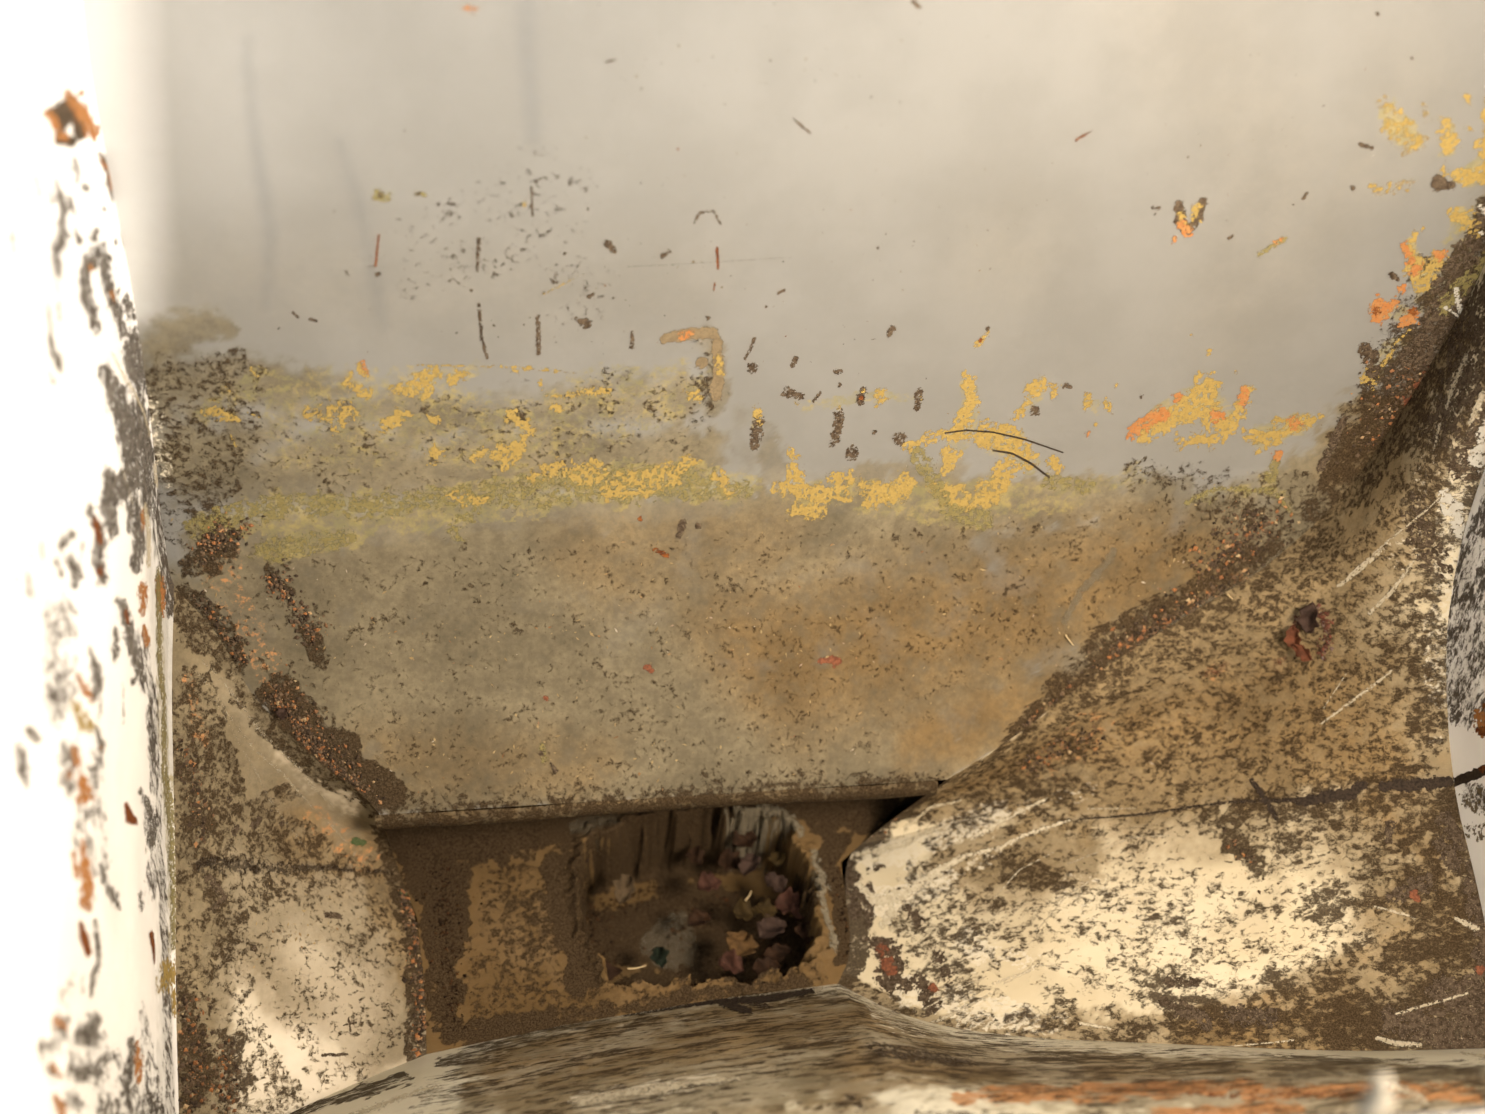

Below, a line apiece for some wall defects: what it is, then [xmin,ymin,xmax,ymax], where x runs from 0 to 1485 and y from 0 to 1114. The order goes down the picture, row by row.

rust [43,87,101,149]
peeling [603,240,617,254]
peeling [302,237,612,436]
peeling [660,315,725,404]
peeling [744,337,764,374]
peeling [1351,93,1485,578]
peeling [182,369,1118,565]
peeling [1126,370,1348,513]
crack [1078,765,1485,821]
rust [962,1081,1368,1114]